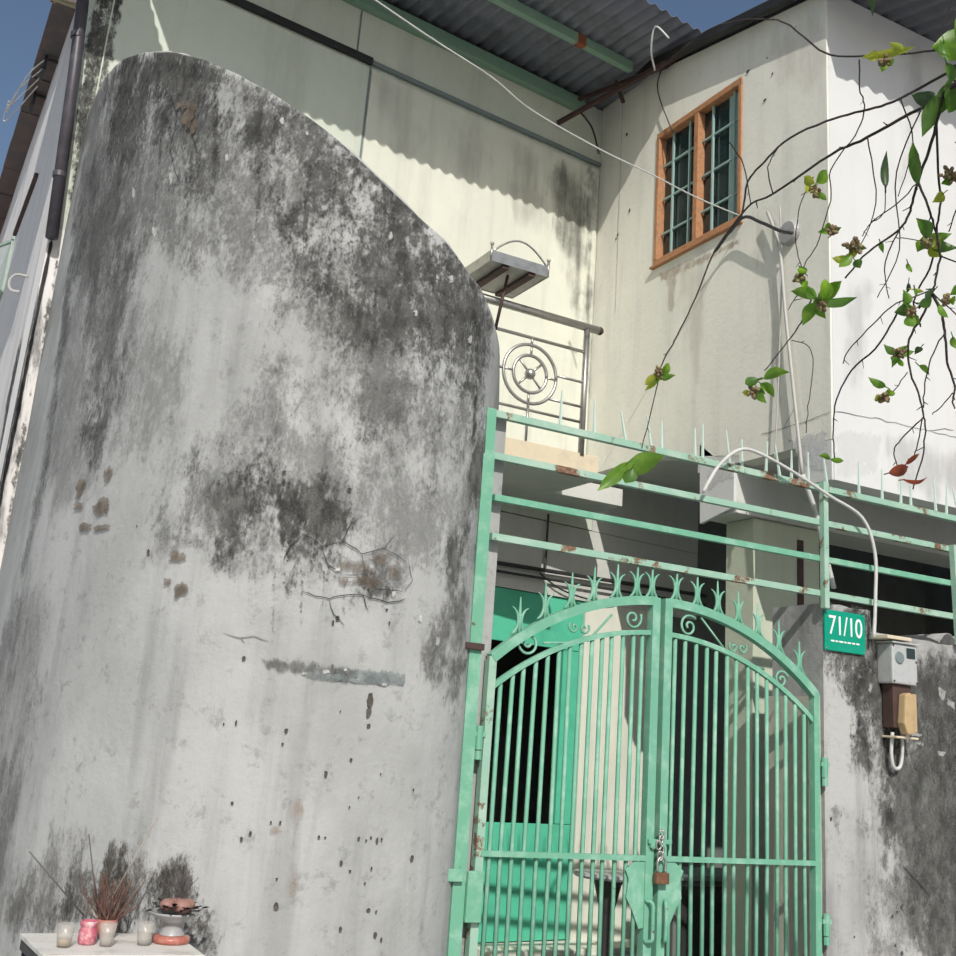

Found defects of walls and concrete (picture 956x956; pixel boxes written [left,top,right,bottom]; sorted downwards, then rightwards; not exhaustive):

leakage [68,0,493,506]
leakage [557,167,588,267]
spalling [73,479,110,531]
leakage [202,436,356,596]
crack [283,516,413,625]
leakage [417,515,470,702]
peeling [266,658,405,728]
leakage [823,605,956,956]